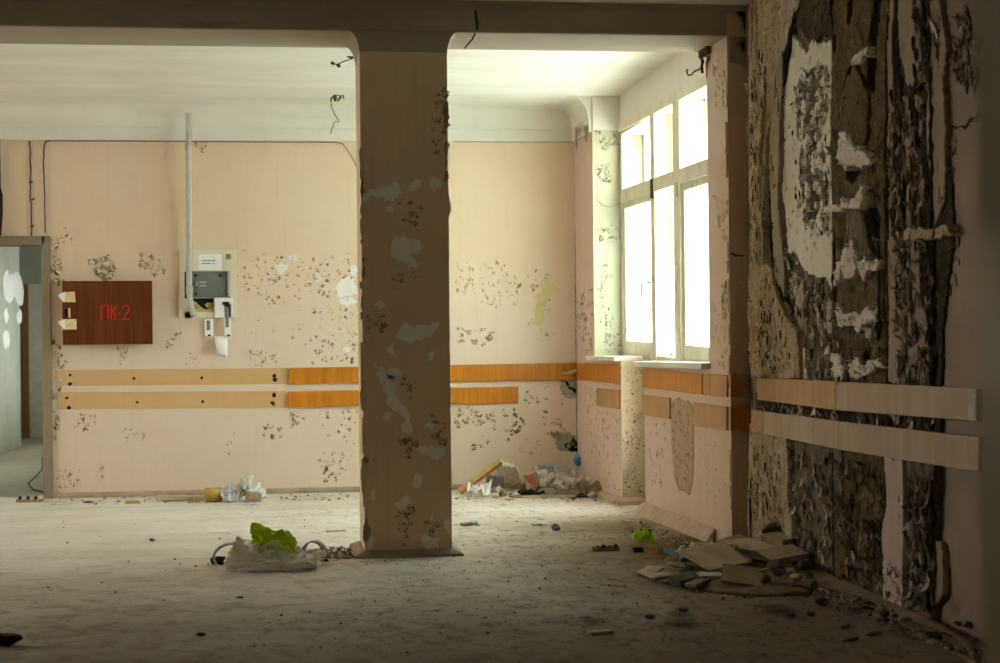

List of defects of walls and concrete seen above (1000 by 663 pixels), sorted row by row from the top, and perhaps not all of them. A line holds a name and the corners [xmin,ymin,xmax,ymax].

peeling [88,254,117,281]
spalling [193,298,214,312]
flaking render [359,87,451,290]
peeling [595,163,613,183]
peeling [595,121,620,150]
peeling [597,222,621,244]
spalling [711,195,730,388]
spalling [769,0,976,387]
peeling [51,338,68,440]
flaking render [237,249,693,550]
spalling [755,392,945,433]
peeling [745,423,950,622]